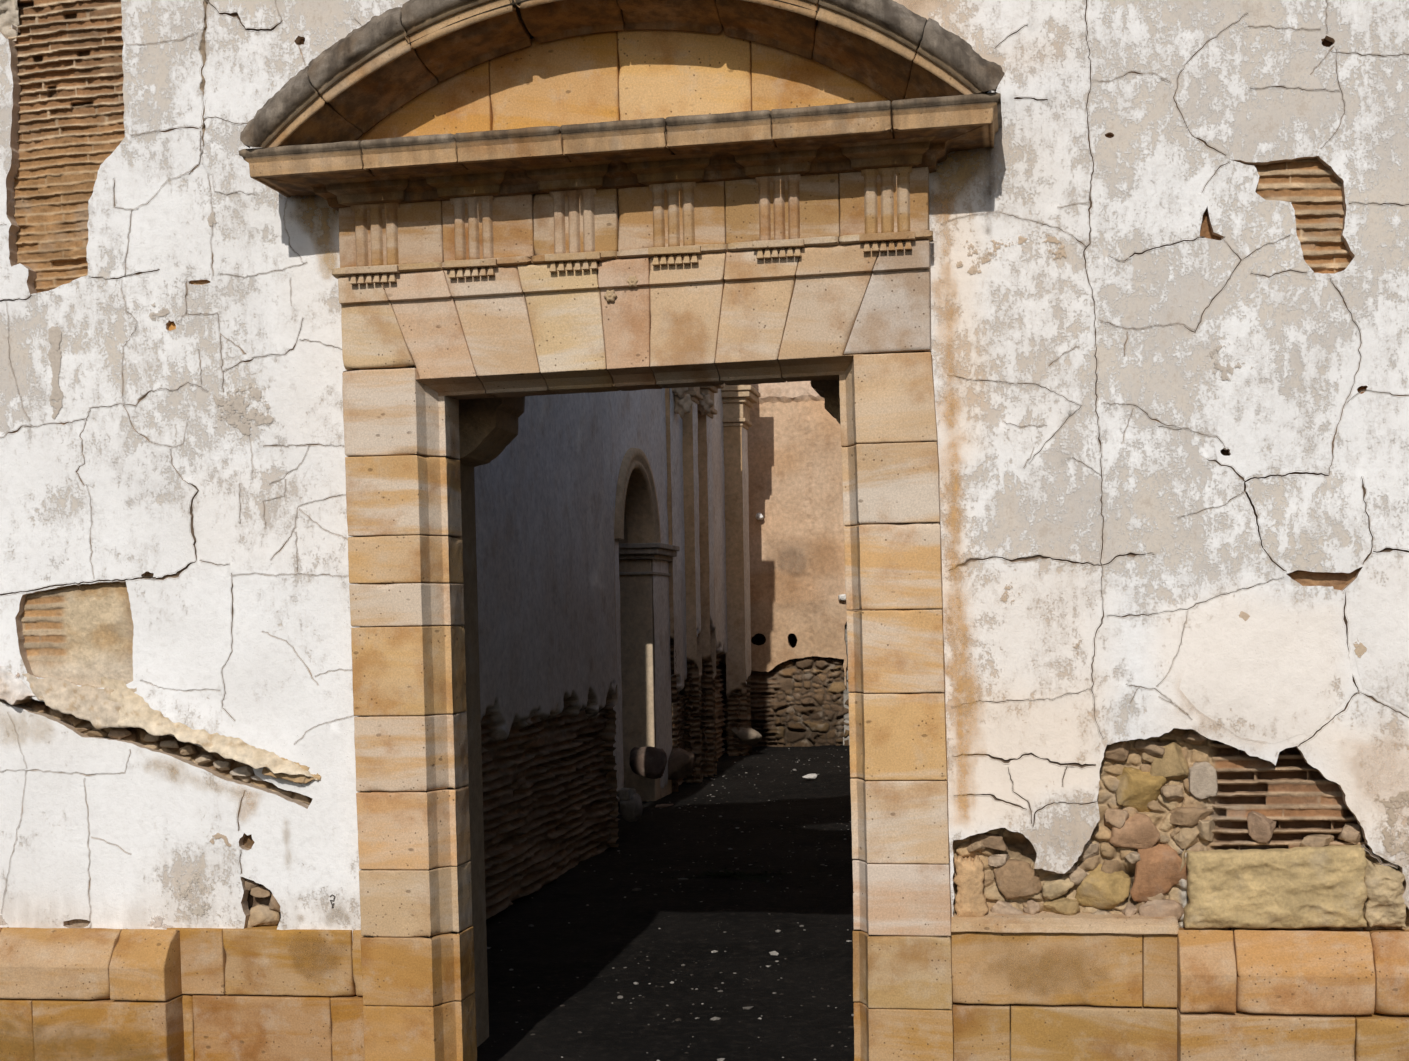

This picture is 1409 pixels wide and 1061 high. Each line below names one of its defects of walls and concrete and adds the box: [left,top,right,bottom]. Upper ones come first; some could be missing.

spalling [0,0,125,293]
spalling [1240,158,1352,274]
crack [0,0,351,719]
crack [941,0,1409,828]
spalling [16,581,134,688]
spalling [17,699,312,805]
crack [294,715,356,745]
spalling [749,656,849,747]
crack [0,712,132,928]
crack [236,789,247,874]
spalling [953,728,1409,932]
crack [1361,844,1398,868]